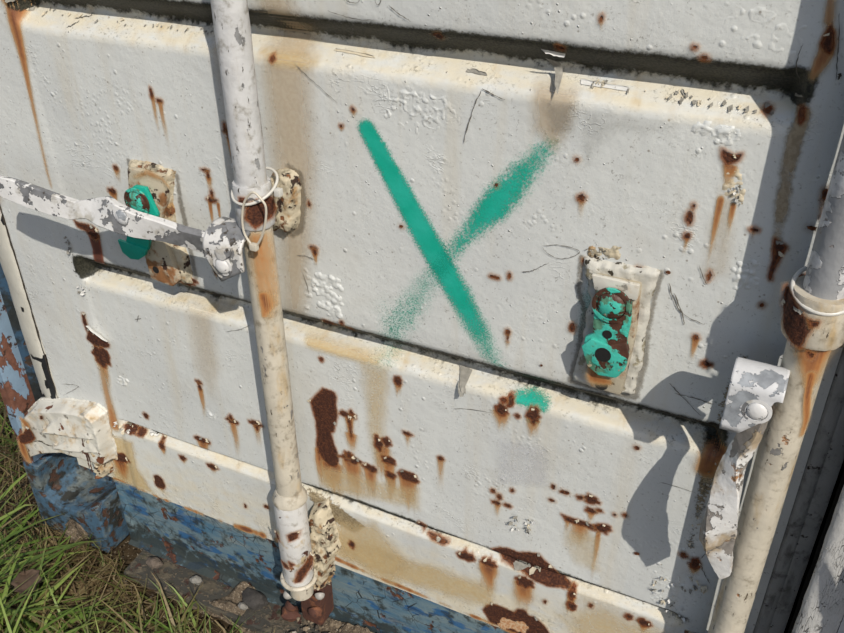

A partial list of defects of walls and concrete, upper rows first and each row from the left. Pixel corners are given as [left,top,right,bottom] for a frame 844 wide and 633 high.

rust [2,0,49,176]
rust [201,168,221,220]
rust [711,196,736,245]
rust [721,148,744,181]
rust [767,237,788,281]
rust [82,312,149,438]
rust [307,388,420,505]
rust [493,391,541,432]
rust [780,284,831,436]
rust [549,484,627,559]
rust [456,547,577,633]
rust [623,613,653,631]